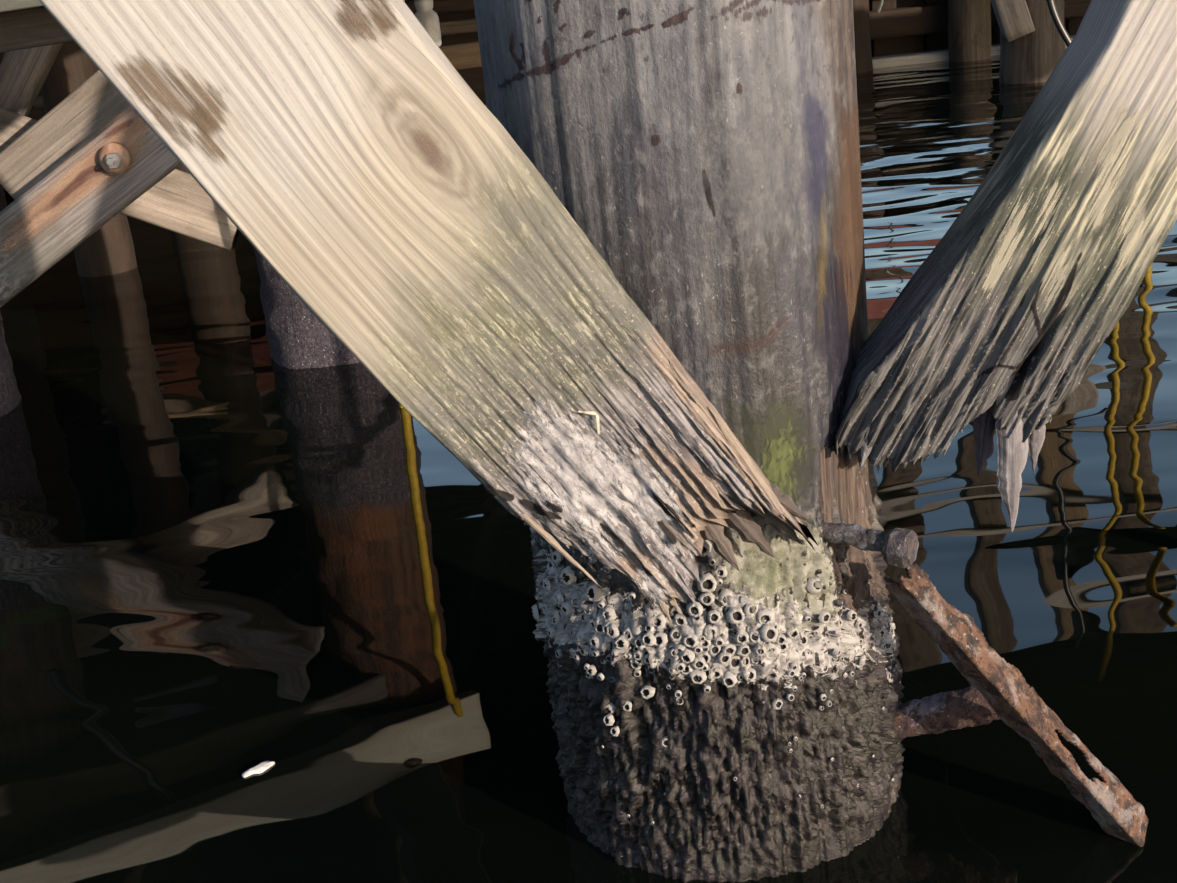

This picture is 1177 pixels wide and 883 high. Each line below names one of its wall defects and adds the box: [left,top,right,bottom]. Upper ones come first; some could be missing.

damp [338,0,398,40]
damp [118,57,226,161]
crack [971,252,1083,401]